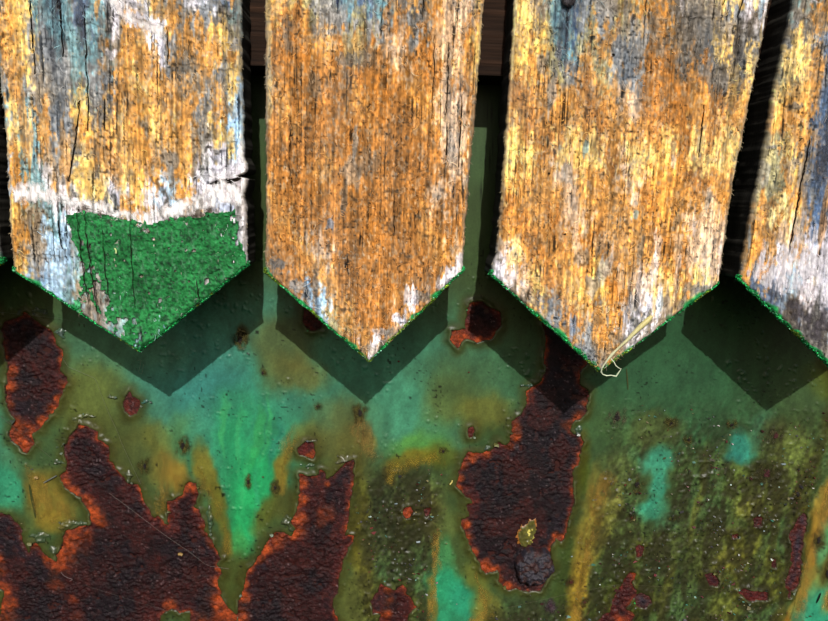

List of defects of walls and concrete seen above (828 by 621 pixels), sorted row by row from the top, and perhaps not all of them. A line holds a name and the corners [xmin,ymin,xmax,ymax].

rust [450,302,501,348]
rust [1,312,68,453]
rust [456,323,589,591]
rust [0,424,354,621]
rust [370,584,416,621]
rust [599,572,651,621]
rust [785,513,807,598]